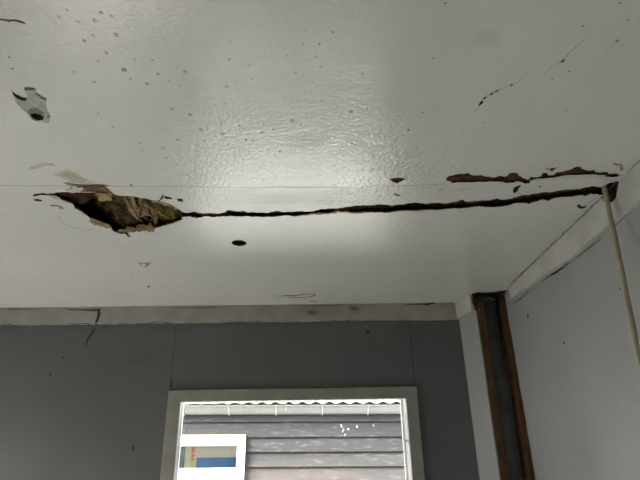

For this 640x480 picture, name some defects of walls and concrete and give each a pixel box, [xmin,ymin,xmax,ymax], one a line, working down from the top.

crack [472,76,523,114]
peeling [34,189,95,209]
crack [181,174,617,218]
peeling [446,163,623,209]
crack [0,310,166,347]